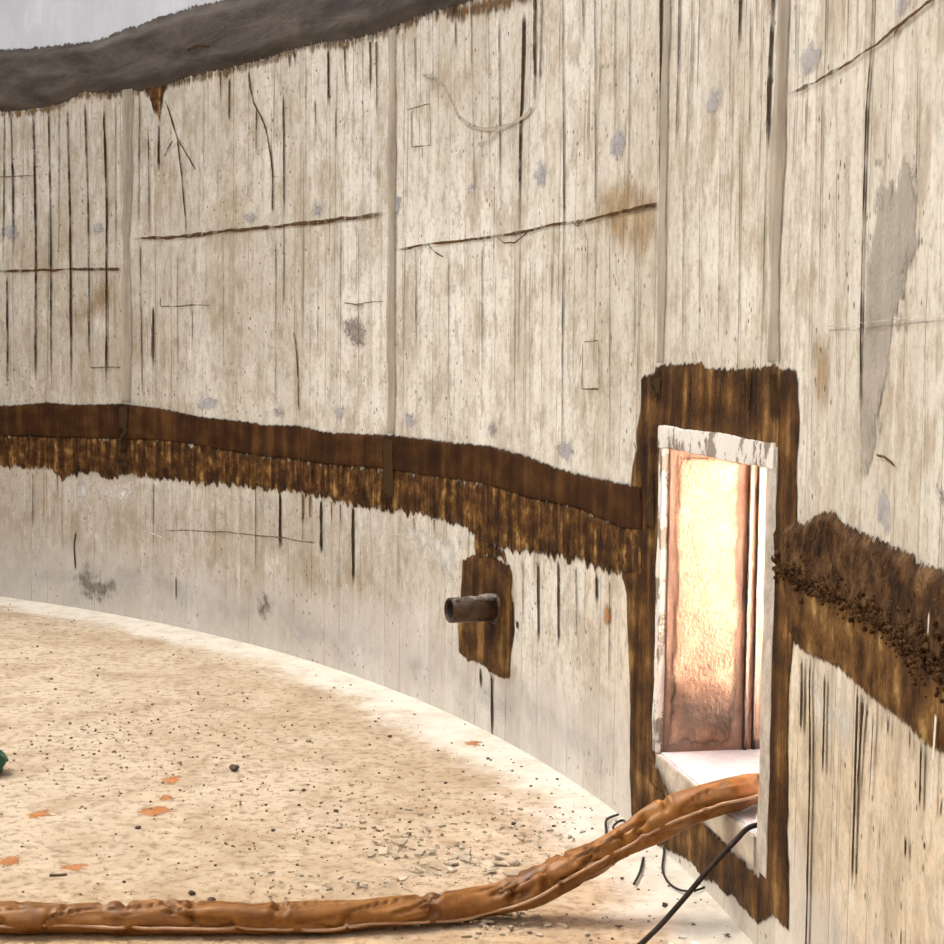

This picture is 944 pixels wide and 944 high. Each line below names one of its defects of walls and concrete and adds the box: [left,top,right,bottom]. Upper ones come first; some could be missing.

crack [795,0,935,92]
crack [0,266,119,274]
crack [141,73,379,240]
crack [402,203,657,257]
peeling [859,157,919,476]
corrosion [0,361,944,930]
leakage [800,662,826,944]
leakage [843,692,874,878]
leakage [909,716,942,815]